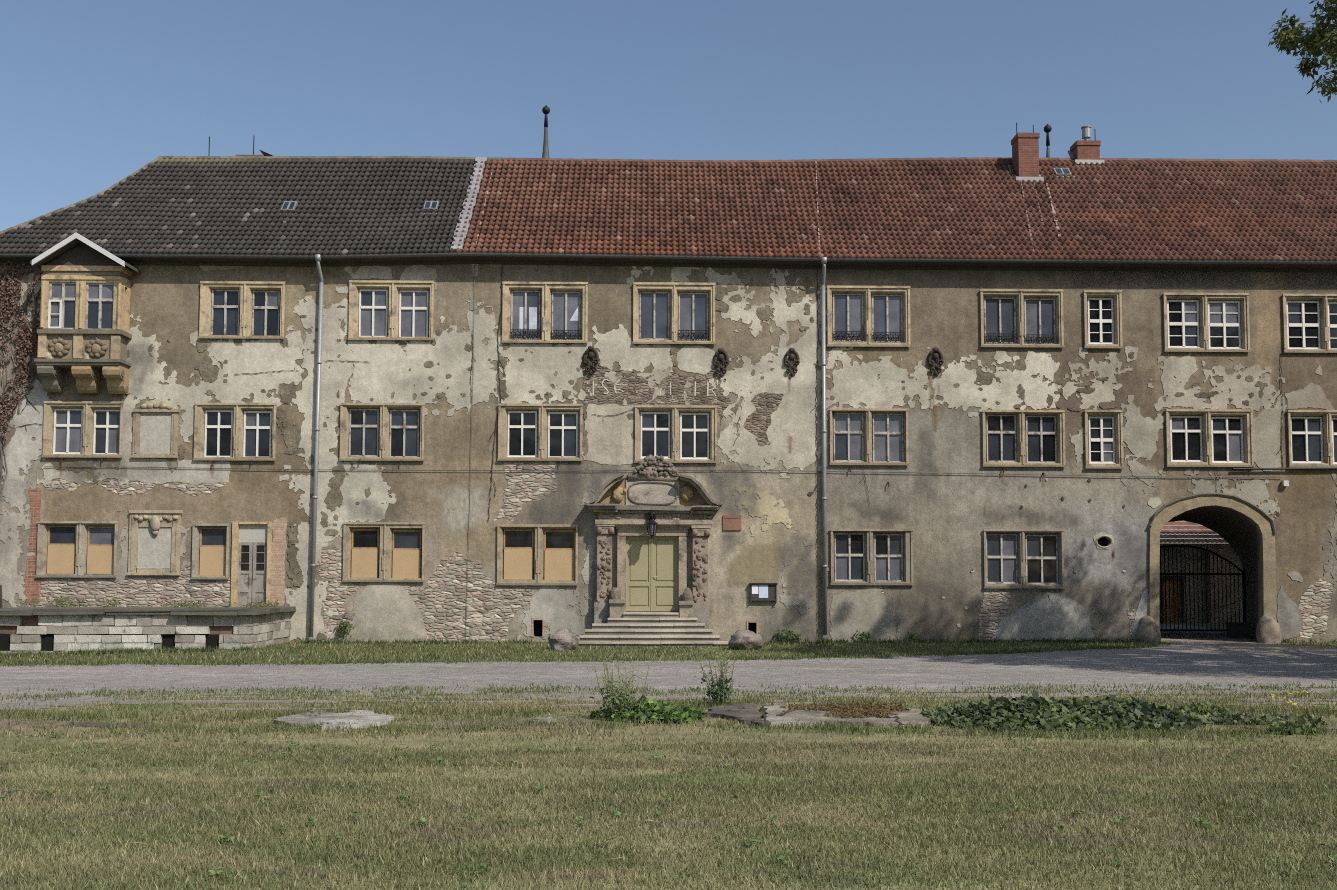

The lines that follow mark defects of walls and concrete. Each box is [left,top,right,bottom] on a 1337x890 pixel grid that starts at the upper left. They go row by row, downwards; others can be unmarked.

peeling [0,265,1334,641]